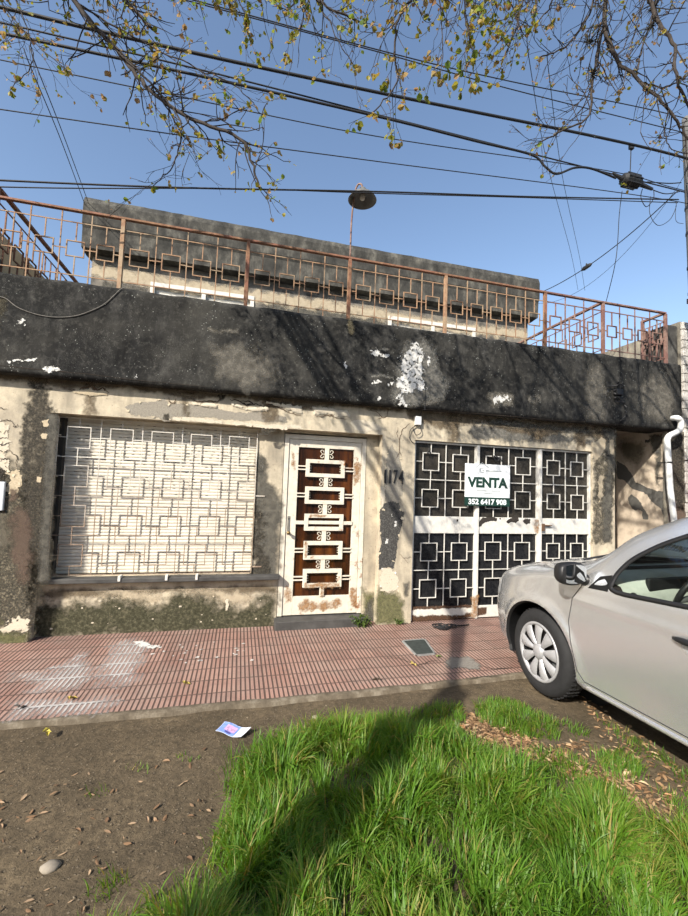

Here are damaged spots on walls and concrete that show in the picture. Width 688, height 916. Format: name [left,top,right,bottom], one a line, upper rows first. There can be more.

leakage [263,301,384,325]
peeling [370,342,431,407]
peeling [125,398,302,430]
peeling [0,420,22,494]
leakage [0,338,686,638]
spalling [378,445,405,593]
peeling [0,616,30,637]
corrosion [299,582,340,612]